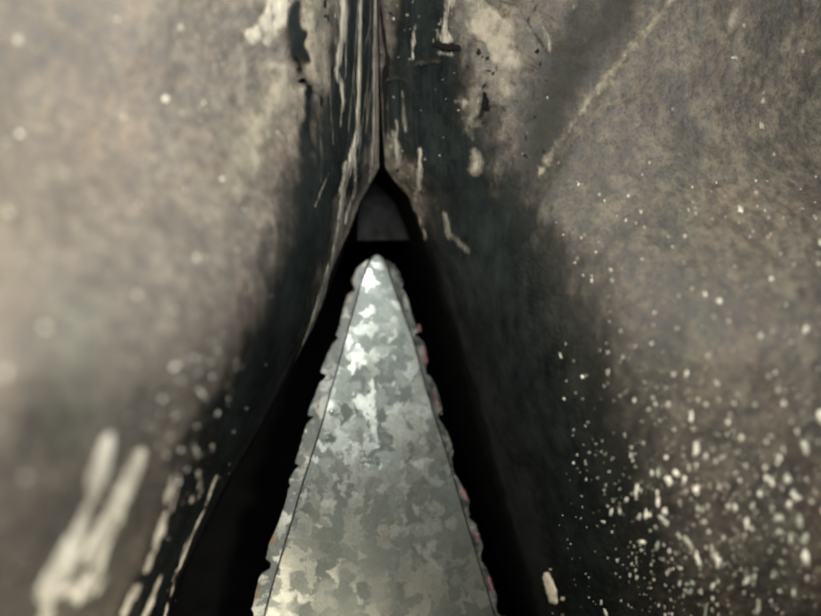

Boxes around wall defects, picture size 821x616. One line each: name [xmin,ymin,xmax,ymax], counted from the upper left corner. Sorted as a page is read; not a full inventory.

leakage [122,0,379,616]
leakage [387,0,676,616]